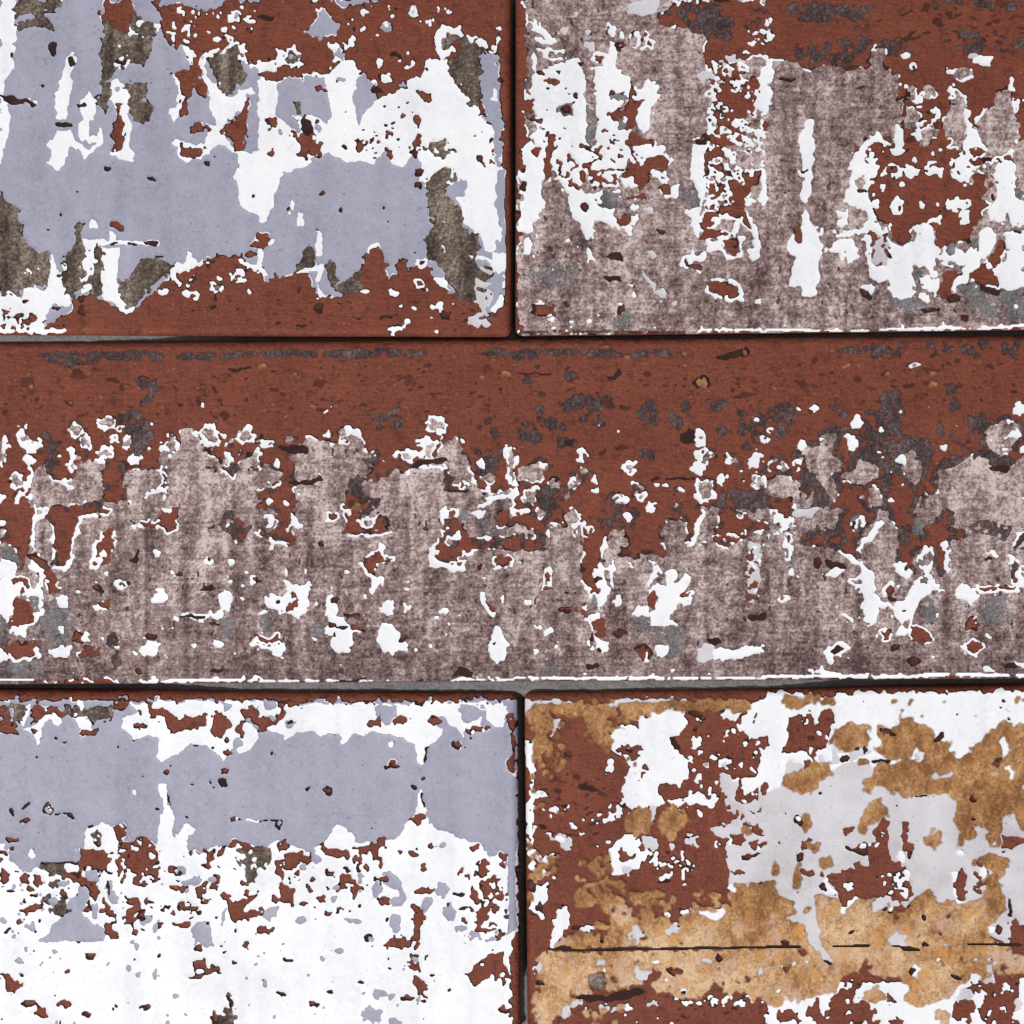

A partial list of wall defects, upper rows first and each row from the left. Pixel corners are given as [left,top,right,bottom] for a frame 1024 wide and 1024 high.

peeling [0,0,1024,336]
spalling [715,346,750,361]
peeling [0,401,1024,1024]
crack [547,944,801,952]
crack [832,943,920,951]
crack [967,940,1023,948]